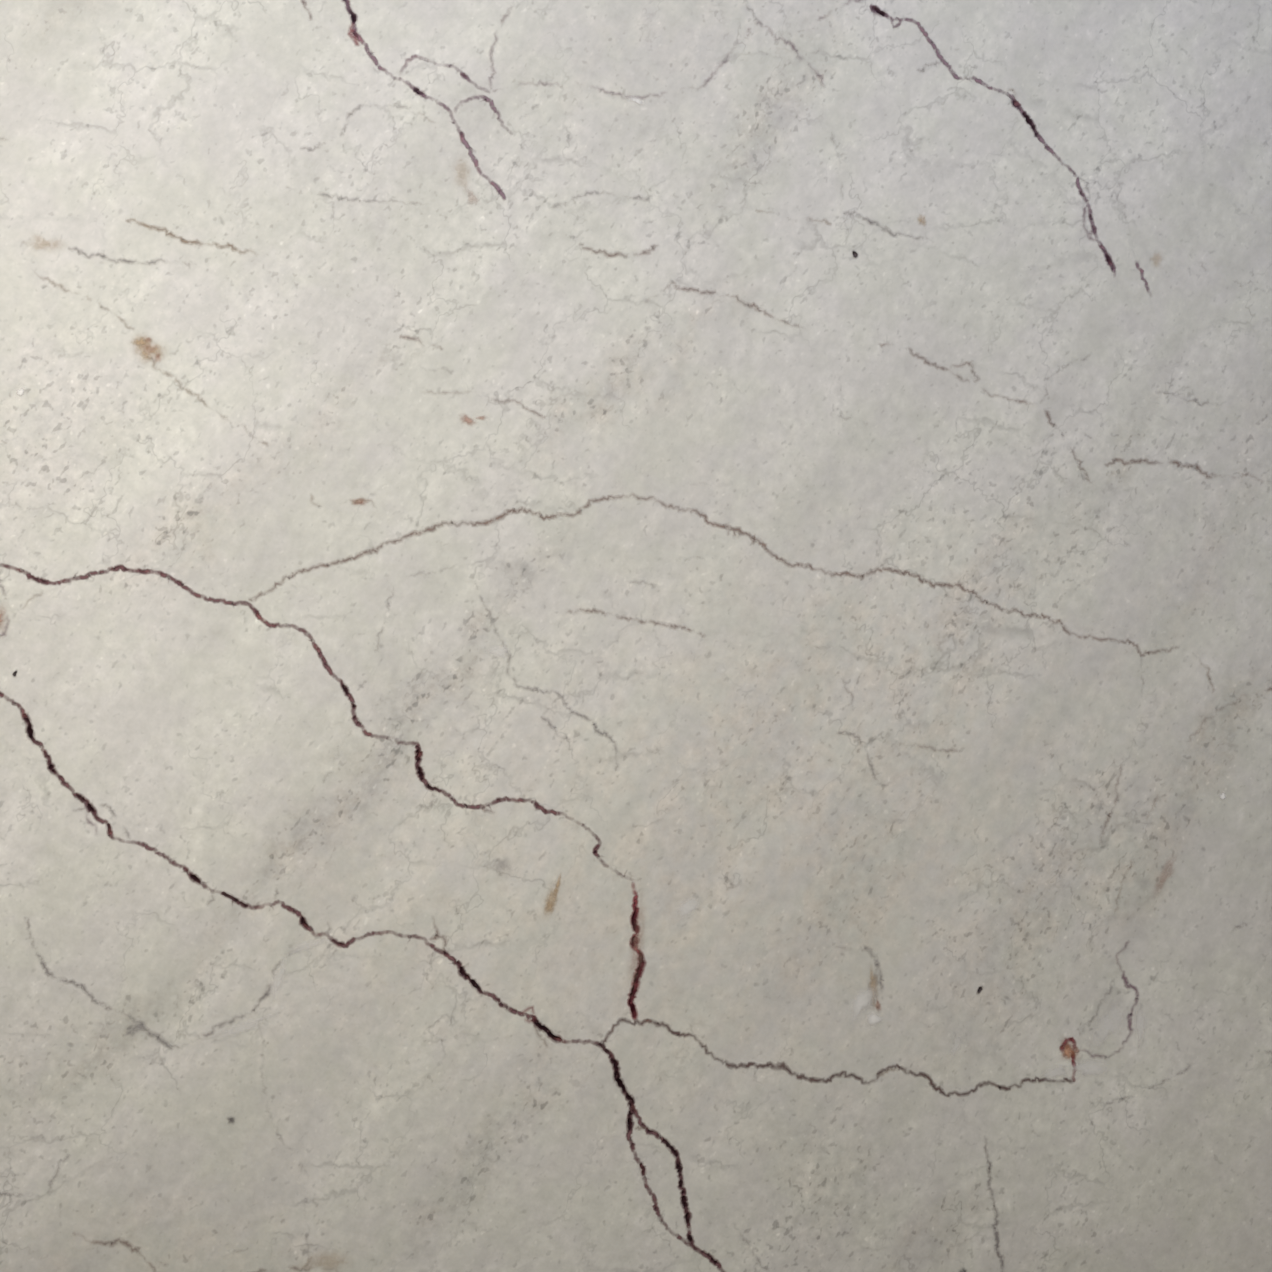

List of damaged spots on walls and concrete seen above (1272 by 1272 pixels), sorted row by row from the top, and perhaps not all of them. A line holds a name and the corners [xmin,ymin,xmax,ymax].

crack [345,0,506,199]
crack [870,5,1149,291]
crack [275,525,437,586]
crack [472,497,608,525]
crack [670,505,983,602]
crack [3,565,560,815]
crack [0,692,206,888]
crack [592,837,600,857]
crack [234,891,1076,1272]
rust [1060,1037,1079,1057]
crack [1122,974,1138,1030]